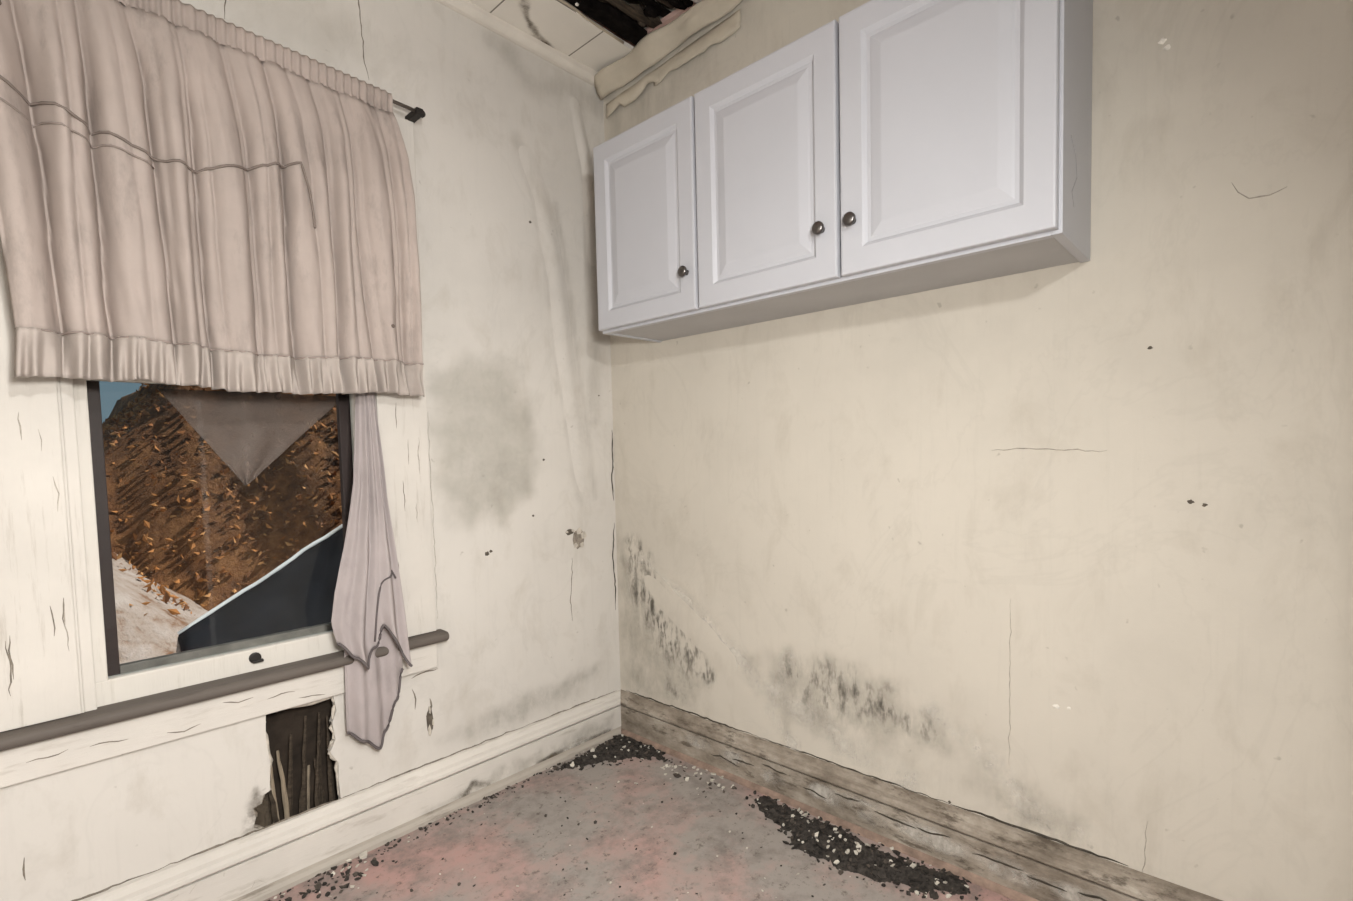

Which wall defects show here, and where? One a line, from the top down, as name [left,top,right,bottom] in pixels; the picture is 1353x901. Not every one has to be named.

crack [17,412,60,511]
crack [5,638,14,696]
crack [50,598,69,649]
spalling [253,696,339,829]